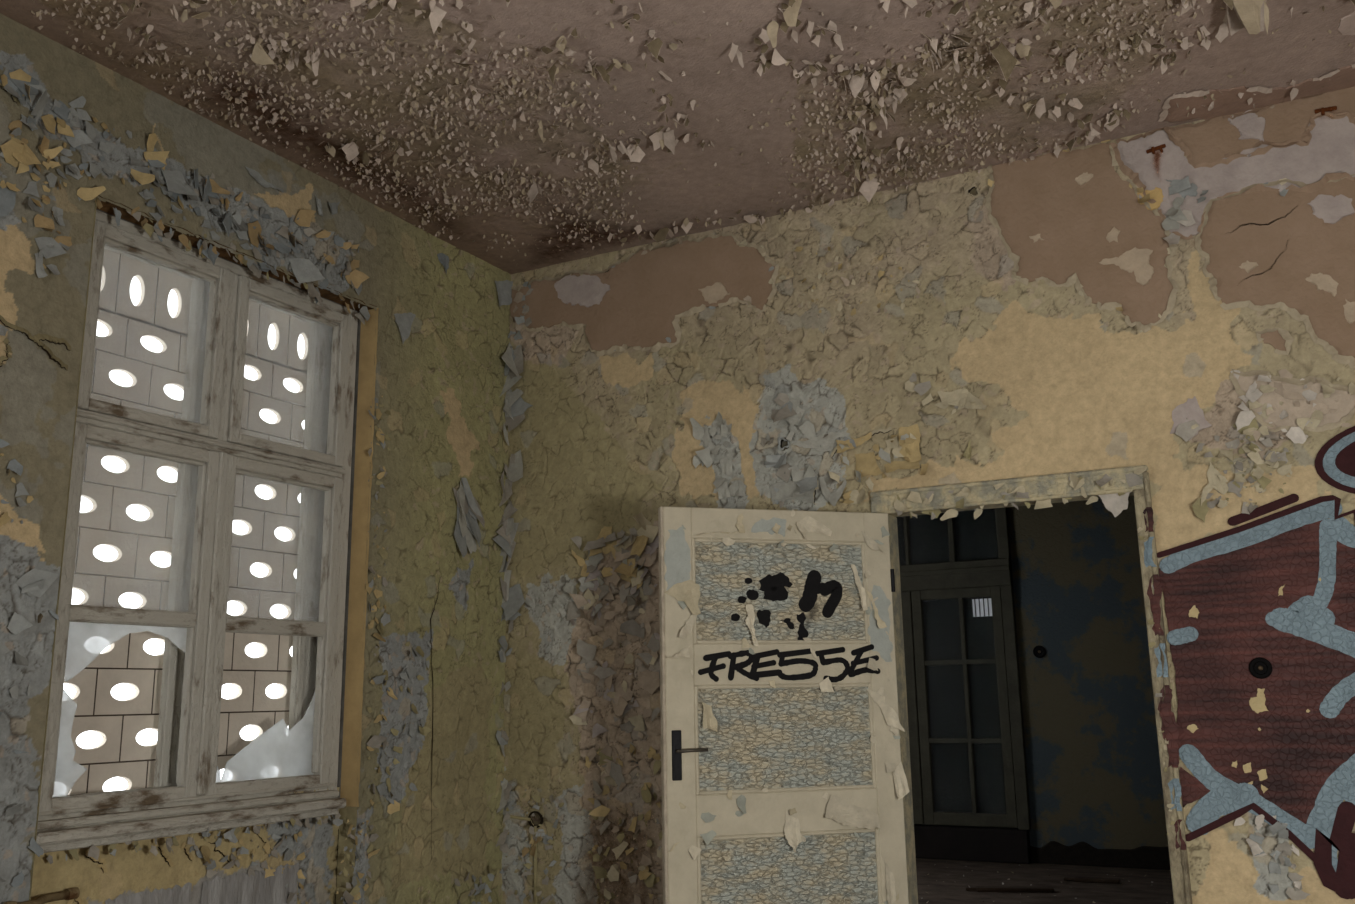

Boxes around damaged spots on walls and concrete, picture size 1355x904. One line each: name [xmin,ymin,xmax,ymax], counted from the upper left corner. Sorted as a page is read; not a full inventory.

peeling [113,0,168,67]
peeling [170,0,240,27]
peeling [233,40,395,77]
peeling [350,0,715,175]
peeling [305,133,543,203]
crack [0,315,72,370]
peeling [0,439,34,527]
peeling [453,280,533,663]
peeling [0,569,59,666]
spalling [1232,761,1268,793]
peeling [1234,814,1311,900]